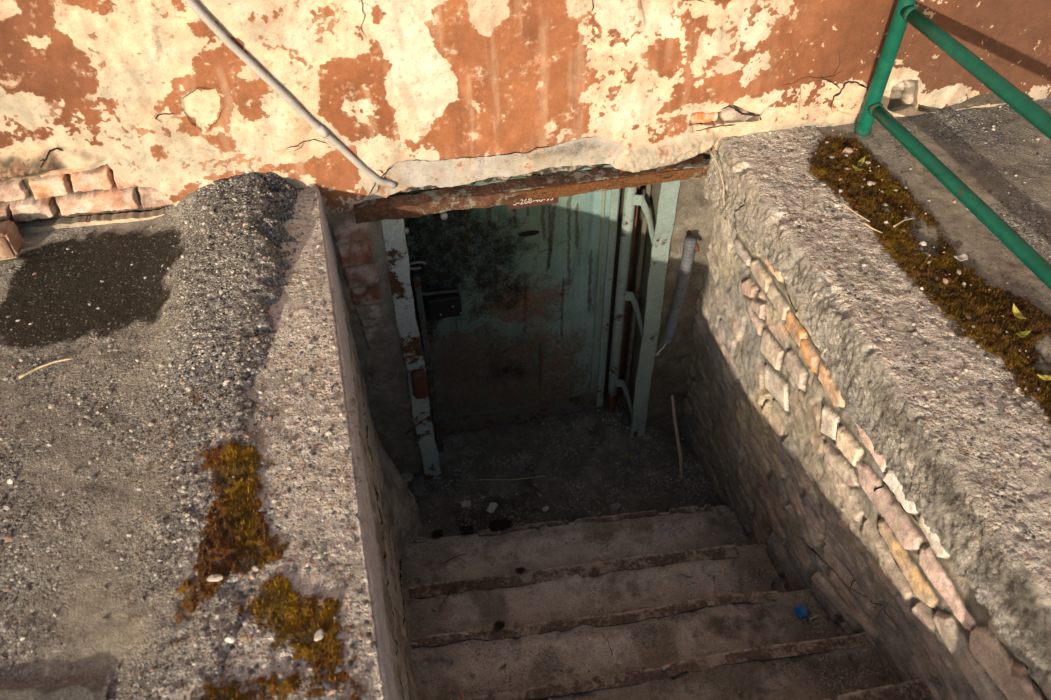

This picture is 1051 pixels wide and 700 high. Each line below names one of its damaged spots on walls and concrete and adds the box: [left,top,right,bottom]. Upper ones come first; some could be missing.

peeling [0,0,868,235]
crack [786,58,868,112]
peeling [881,35,1006,117]
crack [918,92,1029,109]
peeling [1021,65,1051,100]
corrosion [503,167,704,204]